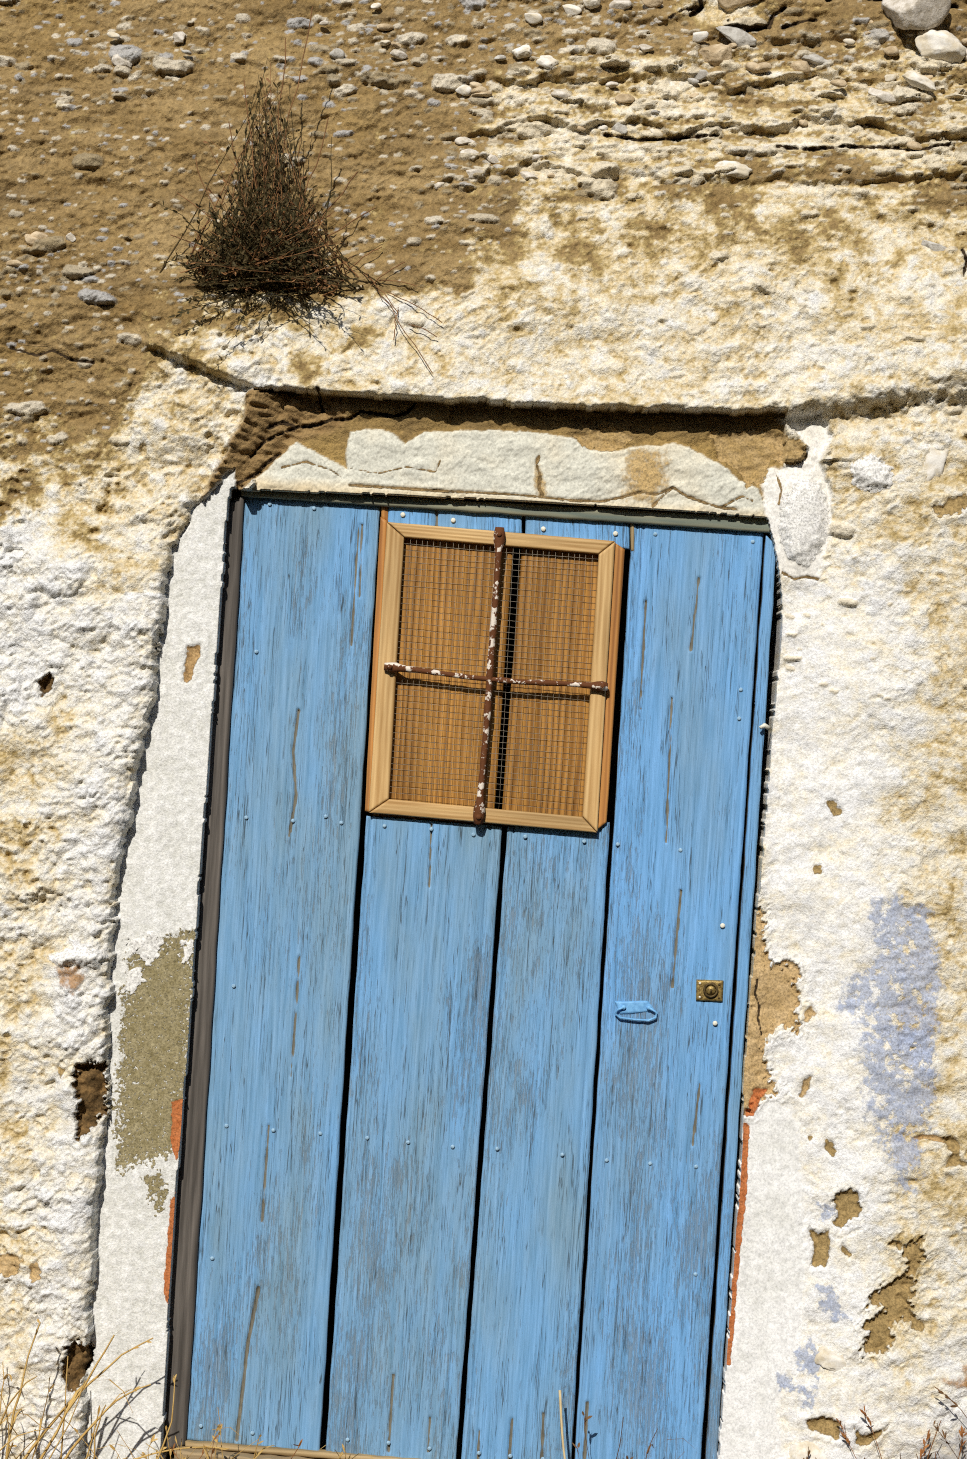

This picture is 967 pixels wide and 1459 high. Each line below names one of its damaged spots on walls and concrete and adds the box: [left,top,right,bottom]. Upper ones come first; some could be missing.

peeling [58,928,196,1302]
spalling [727,907,817,1365]
spalling [809,1188,862,1267]
spalling [858,1236,926,1359]
spalling [807,1417,888,1446]